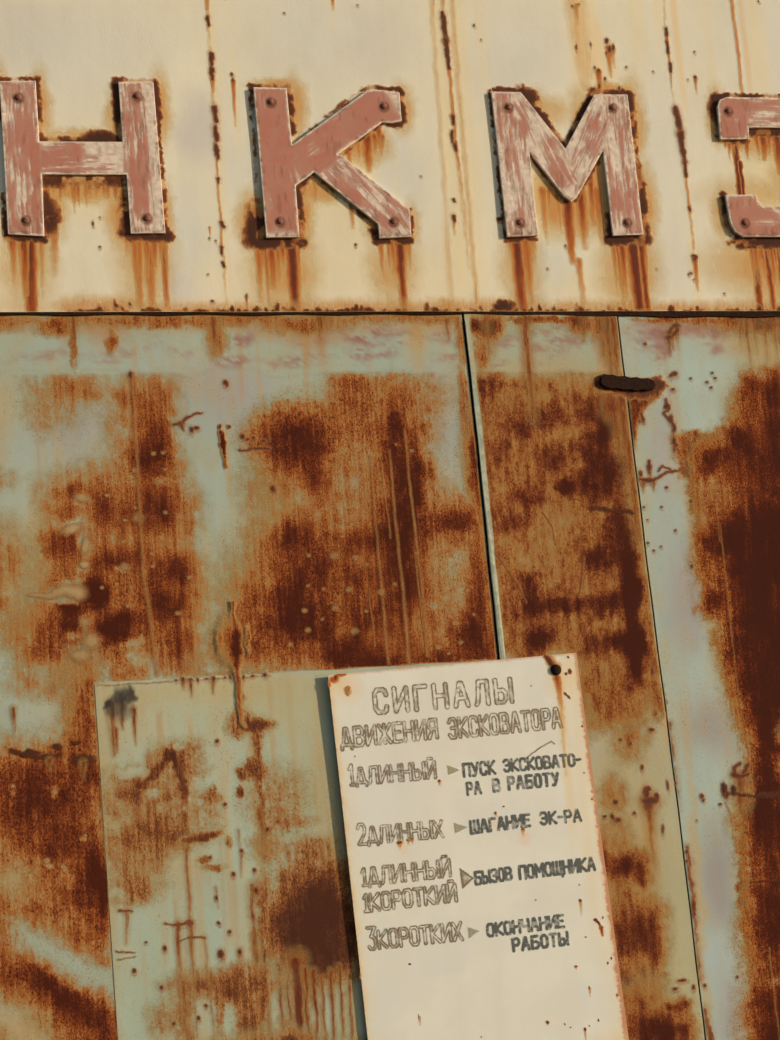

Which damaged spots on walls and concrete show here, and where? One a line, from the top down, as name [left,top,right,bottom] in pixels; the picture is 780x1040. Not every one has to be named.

peeling [2,82,151,234]
peeling [256,89,409,236]
rust [441,0,462,185]
peeling [496,38,641,234]
rust [673,105,698,288]
rust [628,189,780,354]
rust [707,0,780,195]
peeling [720,99,780,138]
peeling [728,196,780,235]
rust [0,75,668,1040]
rust [669,361,780,1040]
rust [591,774,700,1040]